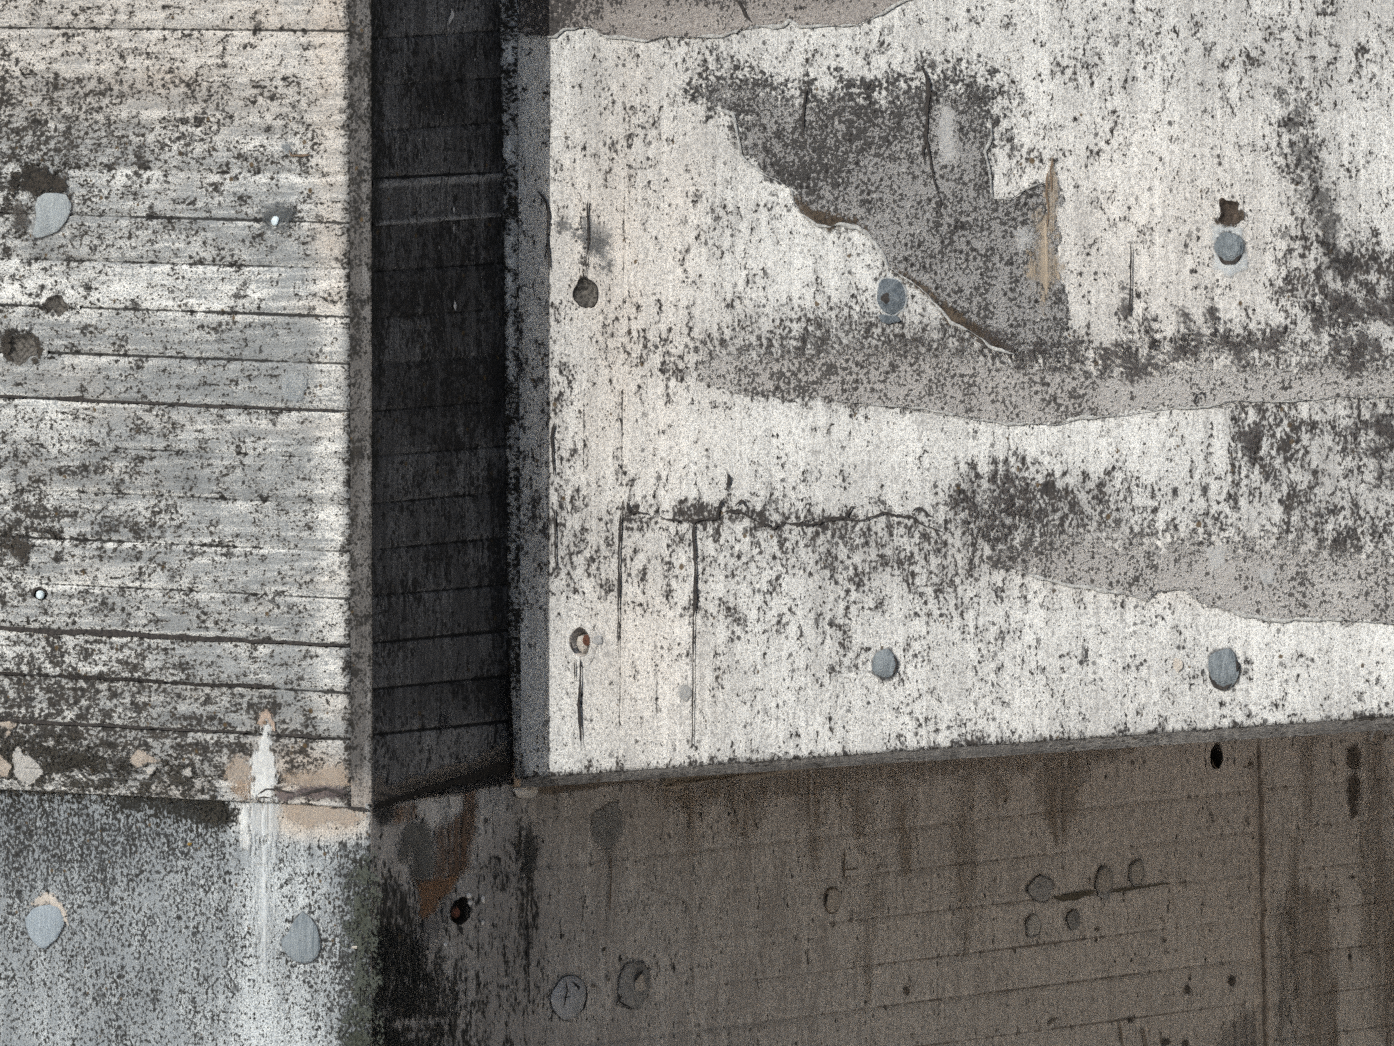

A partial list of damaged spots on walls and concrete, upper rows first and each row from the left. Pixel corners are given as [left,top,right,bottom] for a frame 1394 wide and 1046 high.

spalling [517,0,1394,426]
spalling [964,503,1394,629]
peeling [0,721,43,786]
peeling [130,750,160,774]
corrosion [413,789,476,944]
damp [514,820,537,880]
damp [665,751,1079,877]
damp [1346,730,1393,1028]
damp [356,931,464,1046]